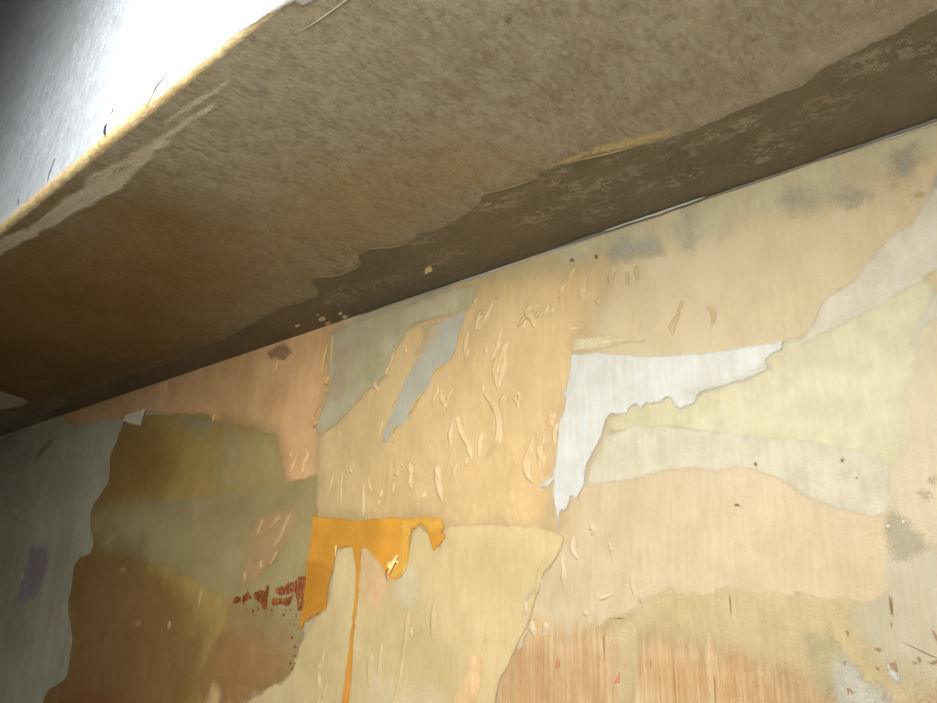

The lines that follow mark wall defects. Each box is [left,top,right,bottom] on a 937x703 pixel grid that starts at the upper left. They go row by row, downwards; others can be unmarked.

spalling [44,0,937,442]
water stain [350,124,937,322]